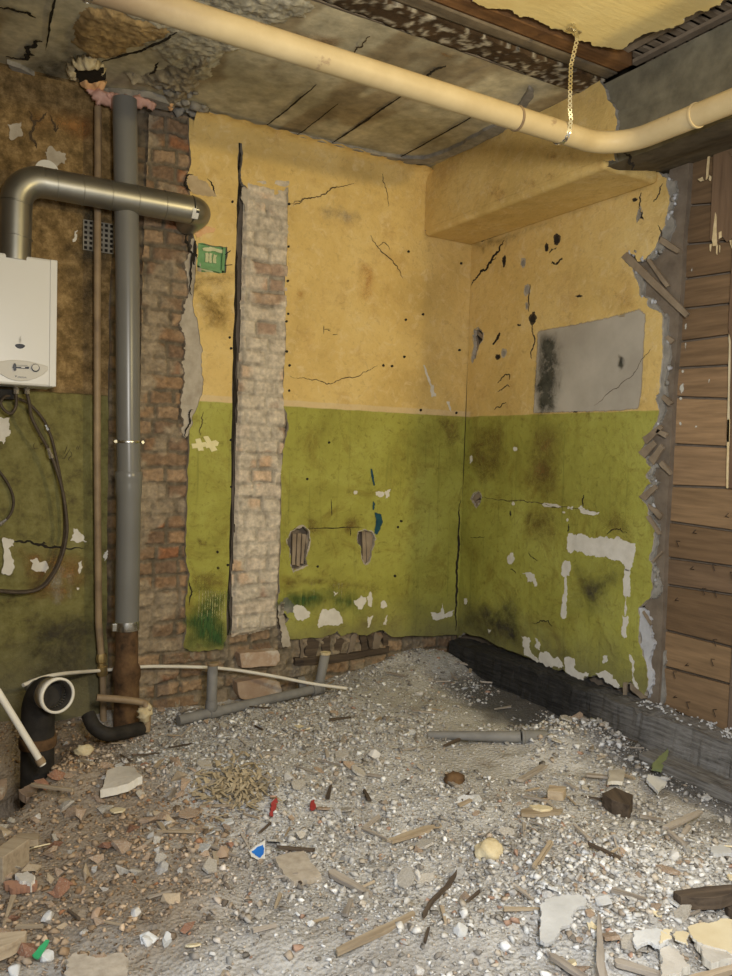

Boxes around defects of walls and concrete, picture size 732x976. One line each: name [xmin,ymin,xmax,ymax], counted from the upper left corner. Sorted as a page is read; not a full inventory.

crack [0,0,56,61]
spalling [71,7,241,81]
spalling [193,0,315,26]
flaking render [137,109,216,197]
flaking render [271,124,506,164]
crack [471,236,504,285]
crack [297,366,376,385]
leakage [536,338,557,410]
flaking render [103,211,117,710]
flaking render [138,180,456,708]
flaking render [521,173,690,699]
leakage [189,578,225,646]